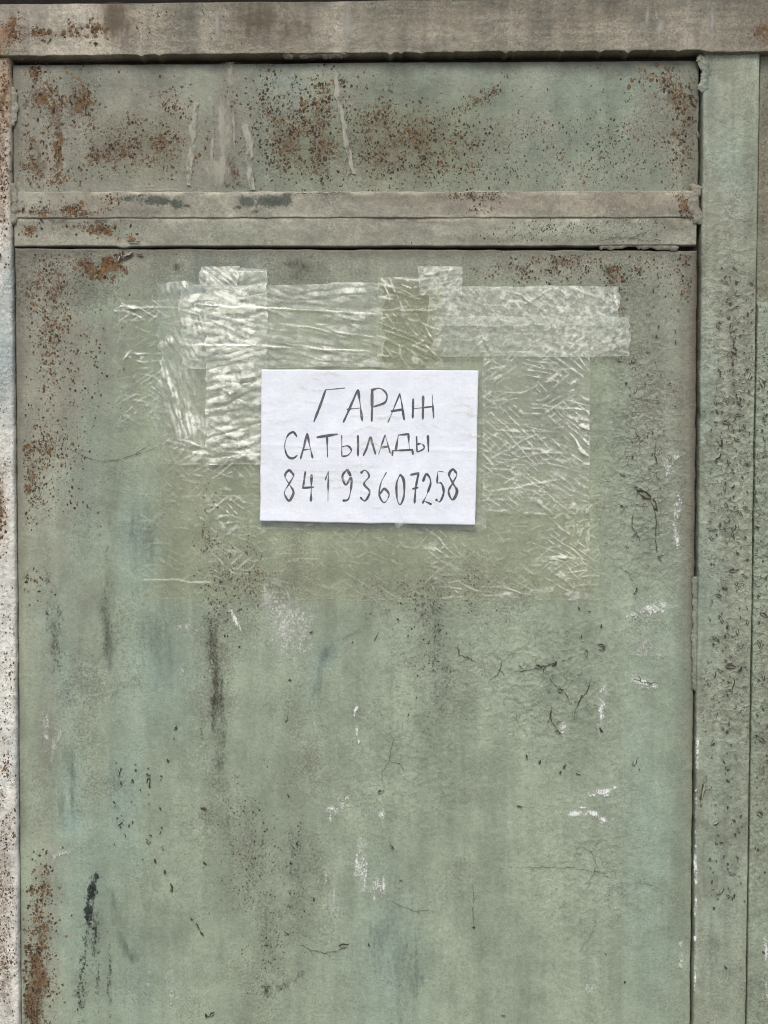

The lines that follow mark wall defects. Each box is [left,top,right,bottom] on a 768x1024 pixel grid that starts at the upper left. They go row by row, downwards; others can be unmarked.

corrosion [0,9,700,562]
crack [632,511,664,562]
corrosion [1,551,56,637]
crack [457,647,591,731]
corrosion [0,650,72,1024]
crack [517,840,609,887]
leakage [74,872,111,1011]